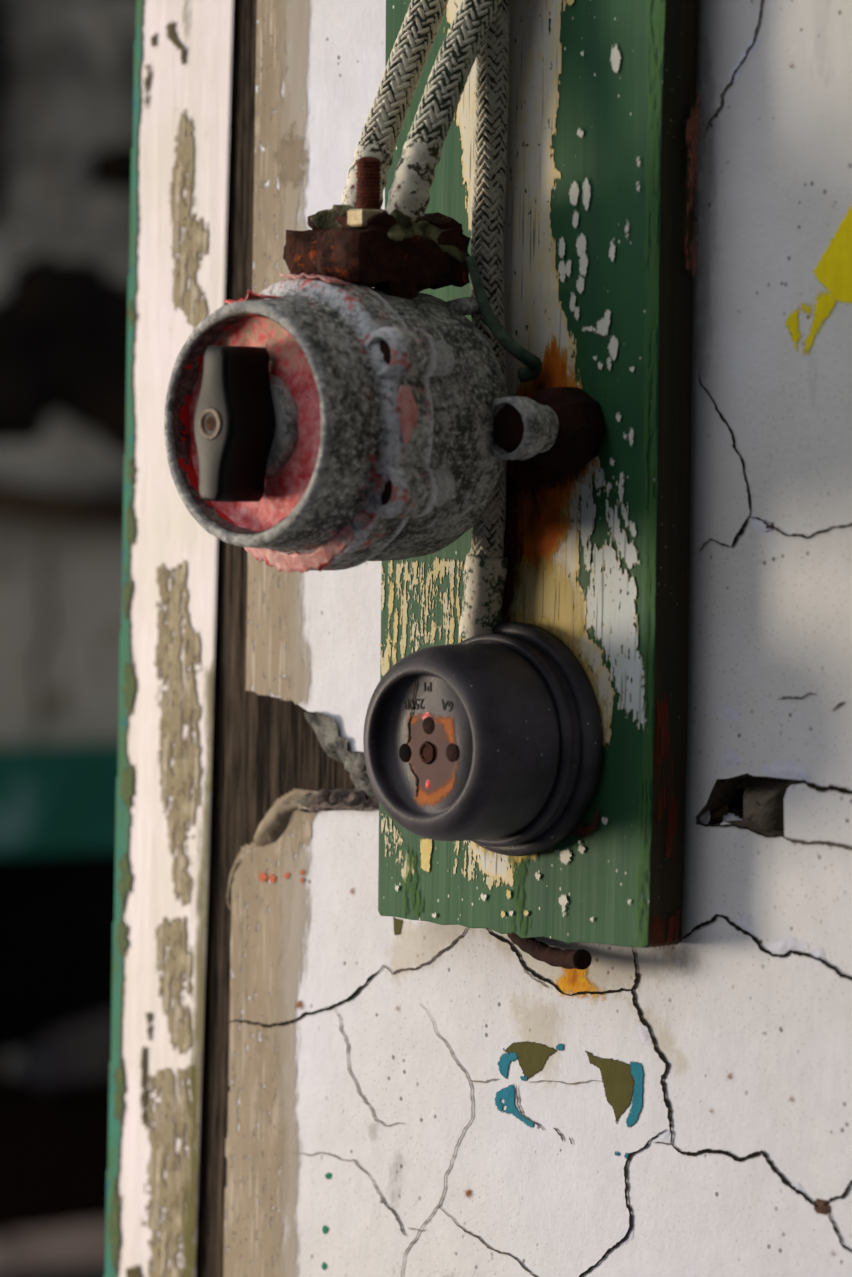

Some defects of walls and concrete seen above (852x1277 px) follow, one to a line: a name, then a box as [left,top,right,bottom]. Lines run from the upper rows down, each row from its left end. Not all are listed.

peeling [252,0,309,293]
peeling [503,0,618,396]
crack [704,0,763,136]
peeling [104,0,201,1277]
peeling [380,557,465,676]
corrosion [515,335,582,399]
corrosion [502,458,595,622]
peeling [502,456,647,746]
crack [698,374,852,552]
peeling [223,552,414,1277]
crack [682,914,852,980]
crack [228,927,852,1277]